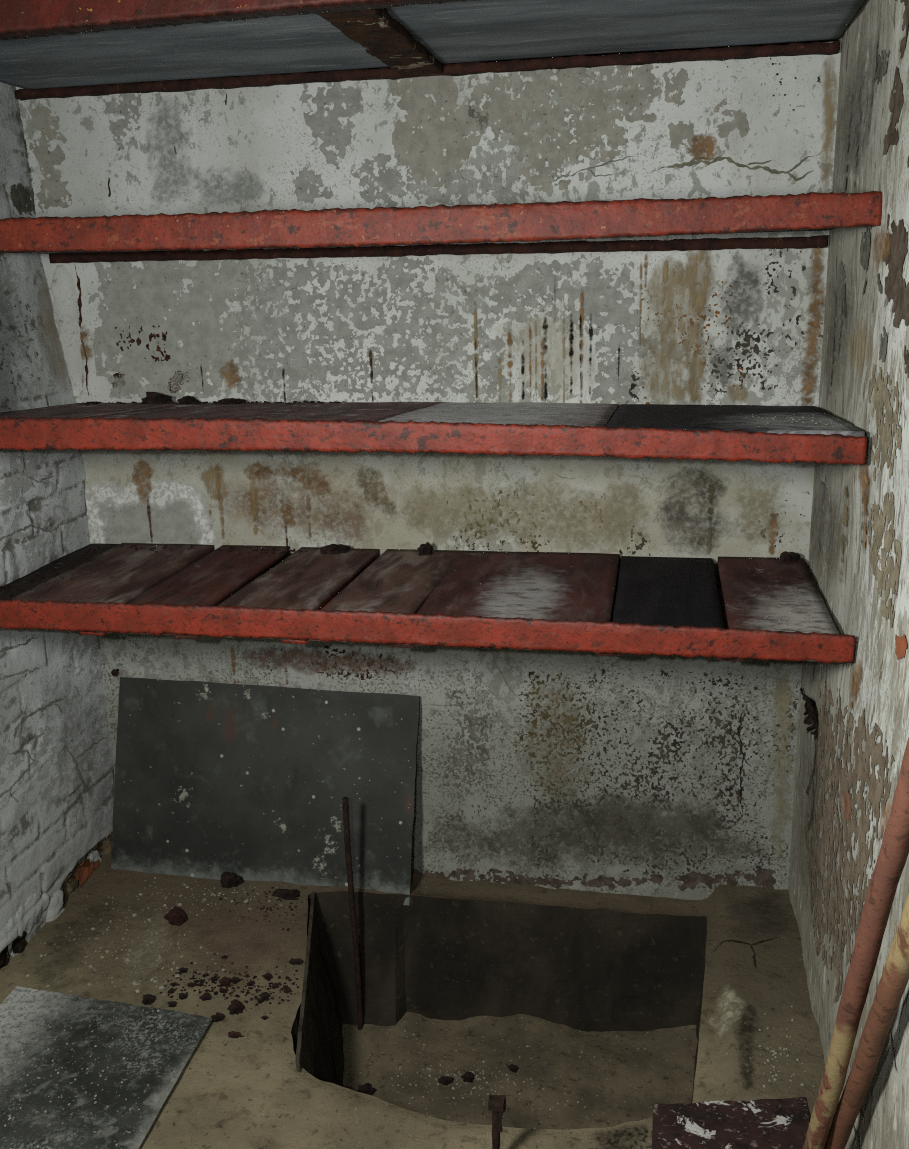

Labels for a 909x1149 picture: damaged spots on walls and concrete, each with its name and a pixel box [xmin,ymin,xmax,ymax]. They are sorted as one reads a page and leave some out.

flaking render [875,0,909,155]
crack [541,150,825,184]
rust [639,250,710,402]
rust [802,248,824,404]
rust [132,461,153,542]
rust [249,463,328,546]
damp [738,488,805,554]
peeling [860,214,909,660]
crack [0,695,113,802]
flaking render [416,868,776,891]
damp [415,665,798,880]
peeling [800,686,894,1003]